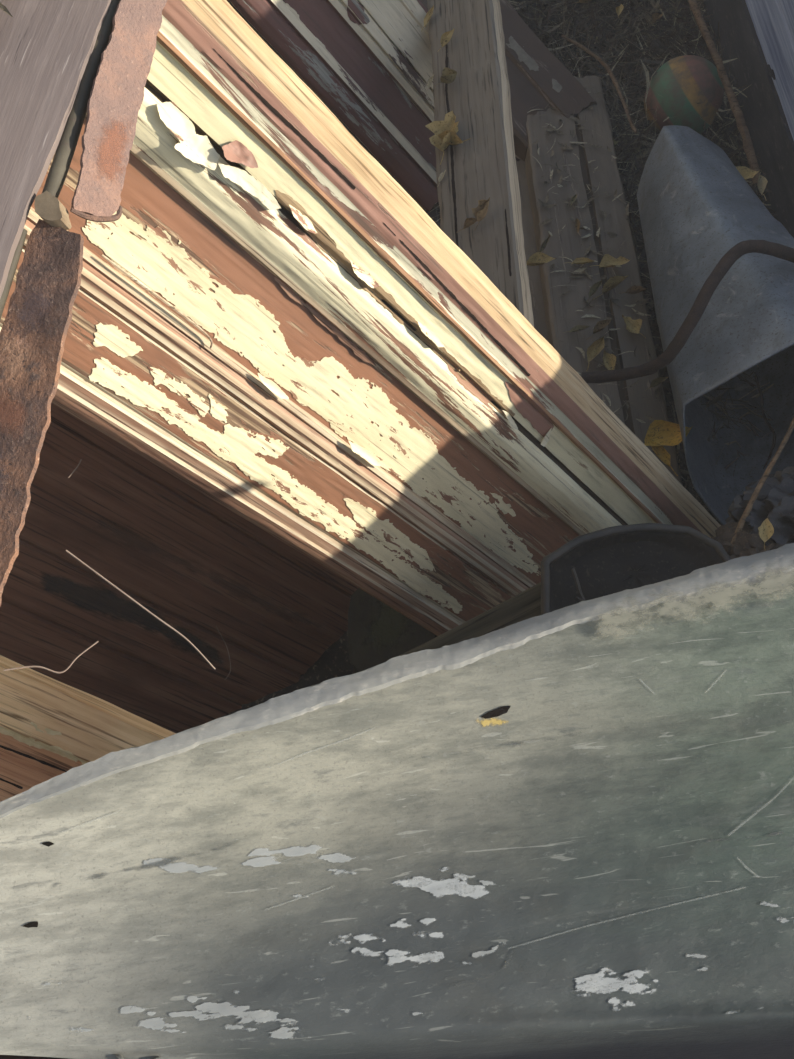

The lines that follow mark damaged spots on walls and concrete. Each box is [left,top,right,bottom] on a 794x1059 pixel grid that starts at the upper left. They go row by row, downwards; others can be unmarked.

peeling [347,0,370,25]
peeling [506,36,539,71]
peeling [157,102,258,170]
peeling [82,190,554,614]